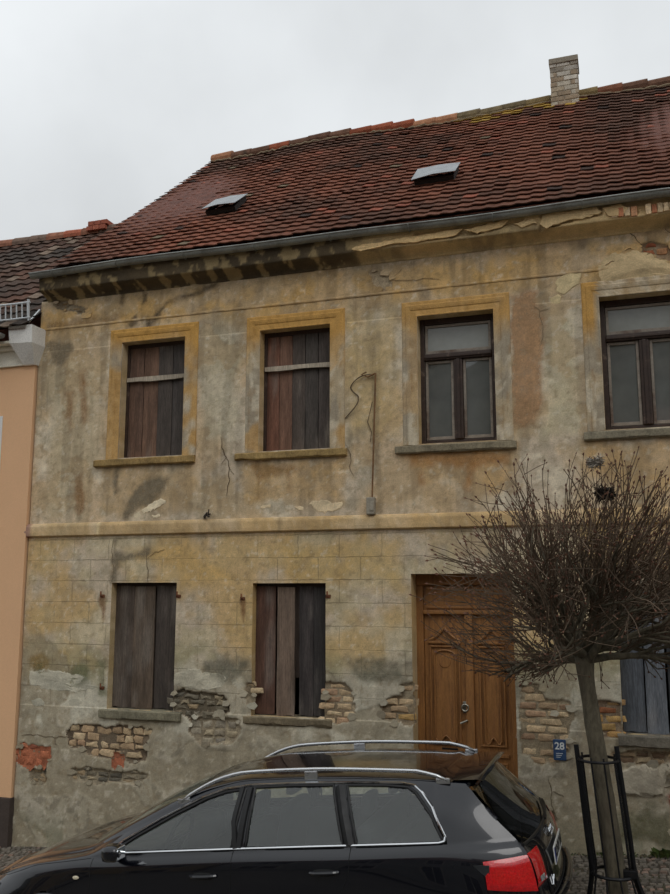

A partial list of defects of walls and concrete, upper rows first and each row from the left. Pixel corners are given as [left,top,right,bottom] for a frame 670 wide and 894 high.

flaking render [352,202,670,252]
crack [220,437,234,496]
spalling [167,668,264,748]
spalling [319,681,357,724]
spalling [376,683,419,727]
spalling [515,681,578,766]
spalling [598,699,627,738]
flaking render [16,742,51,785]
spalling [66,724,152,786]
flaking render [608,749,670,799]